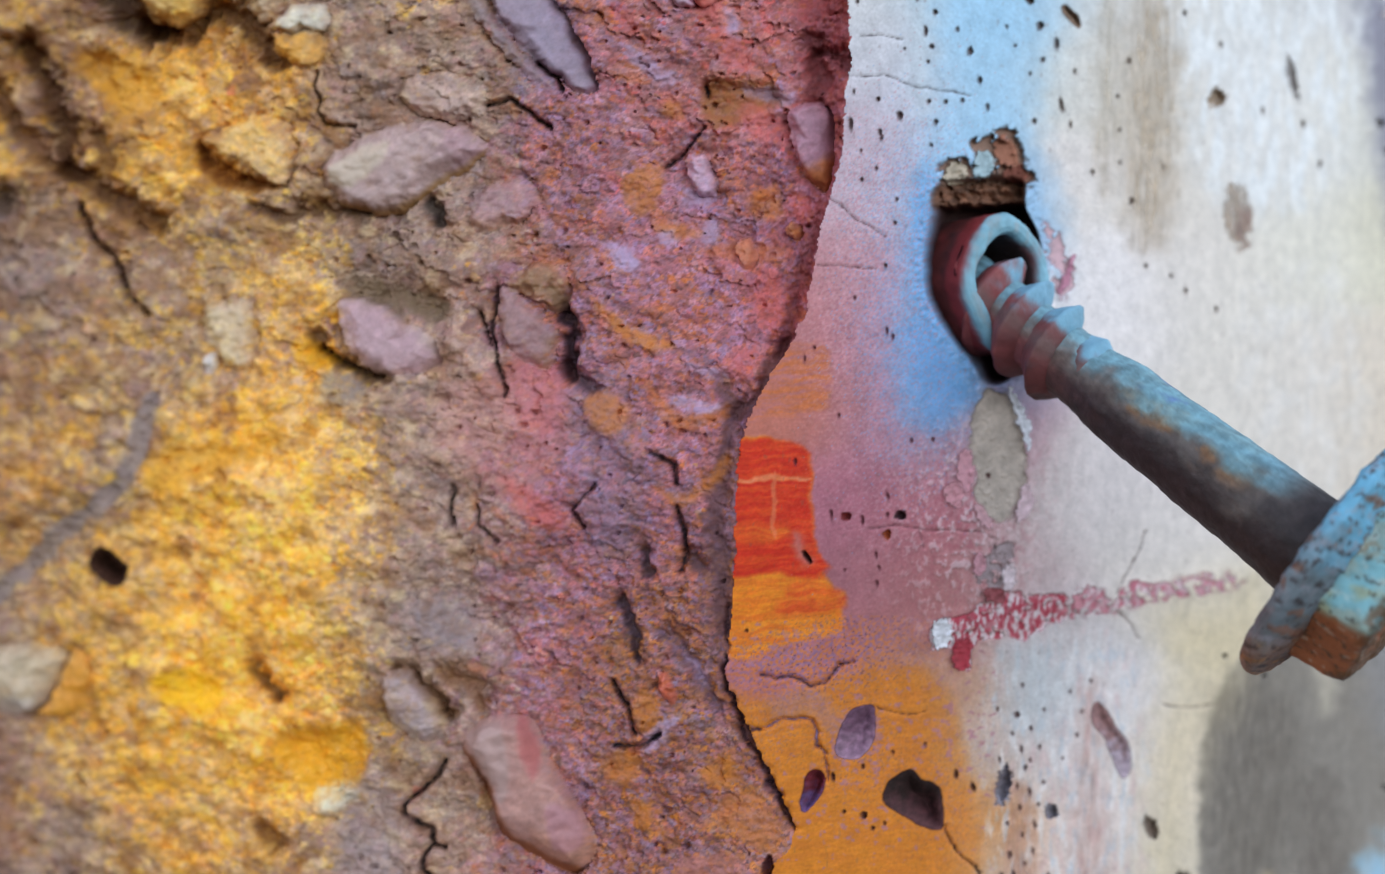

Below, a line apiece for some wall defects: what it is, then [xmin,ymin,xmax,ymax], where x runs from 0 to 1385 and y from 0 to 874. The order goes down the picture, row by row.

spalling [938,128,1035,186]
spalling [0,0,853,874]
crack [724,607,850,820]
spalling [835,704,876,759]
crack [404,758,448,874]